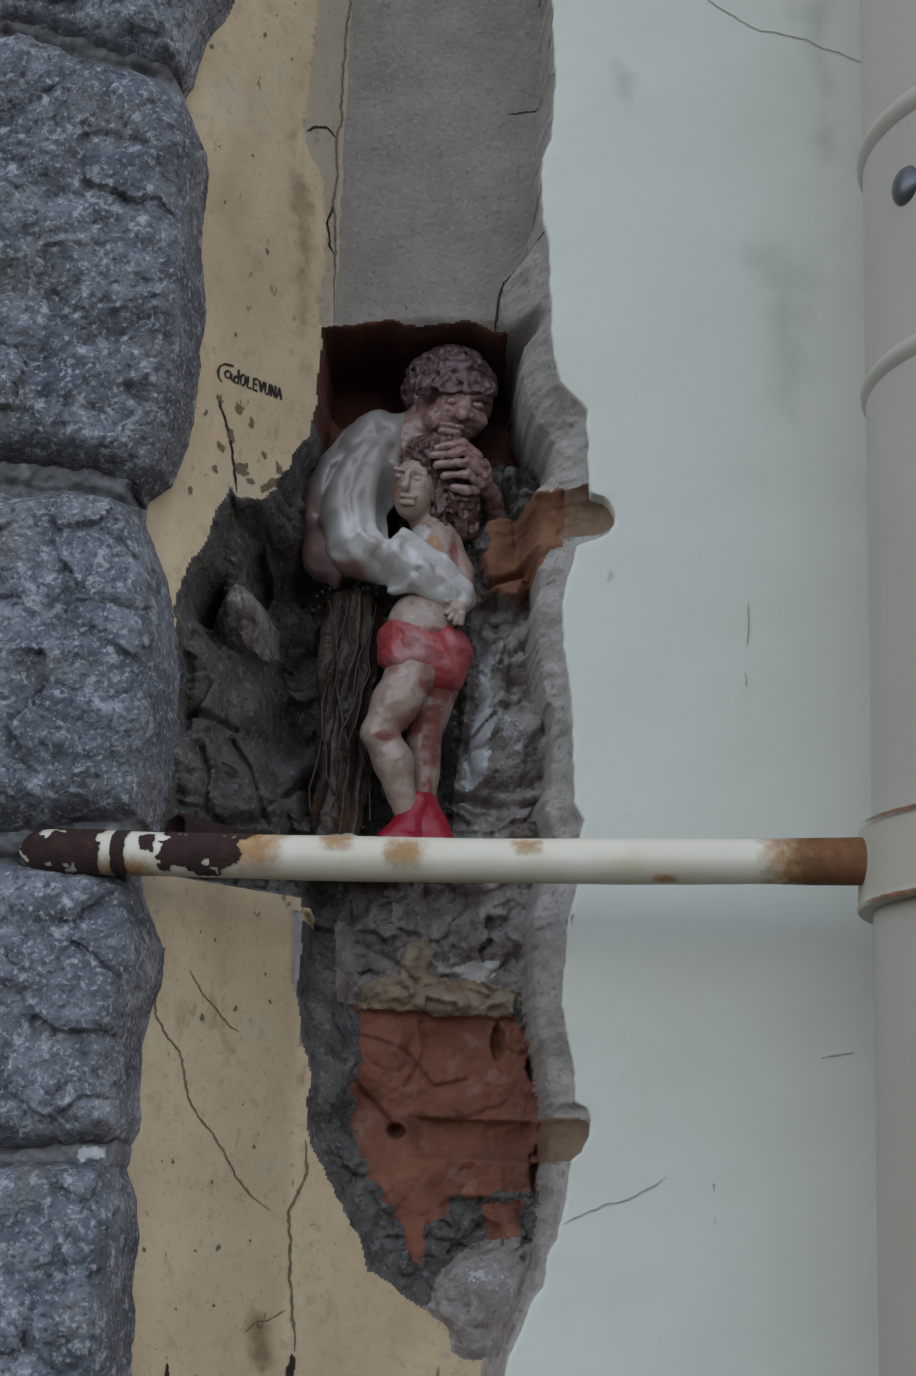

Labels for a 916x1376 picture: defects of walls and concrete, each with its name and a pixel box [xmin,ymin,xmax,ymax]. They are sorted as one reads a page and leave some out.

crack [708,0,861,62]
crack [307,0,352,315]
spalling [155,0,614,839]
corrosion [19,828,272,876]
corrosion [774,804,916,903]
crack [190,971,238,1031]
spalling [181,877,591,1376]
crack [154,999,309,1376]
crack [563,1177,666,1224]